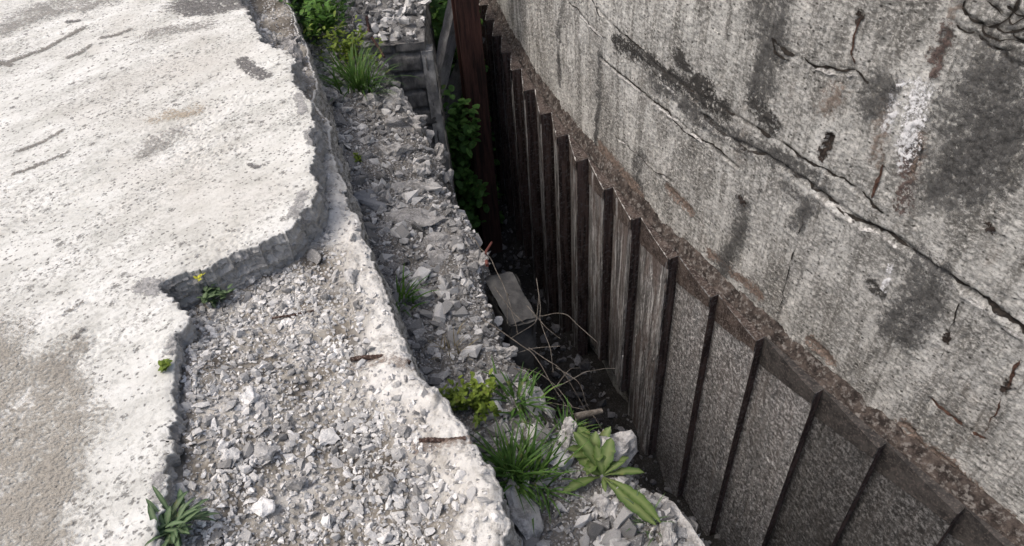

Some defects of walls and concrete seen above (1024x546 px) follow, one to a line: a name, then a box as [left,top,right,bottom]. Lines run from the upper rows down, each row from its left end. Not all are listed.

water stain [743,0,793,104]
crack [956,0,1024,65]
crack [592,0,883,213]
water stain [856,34,1024,222]
crack [779,214,805,308]